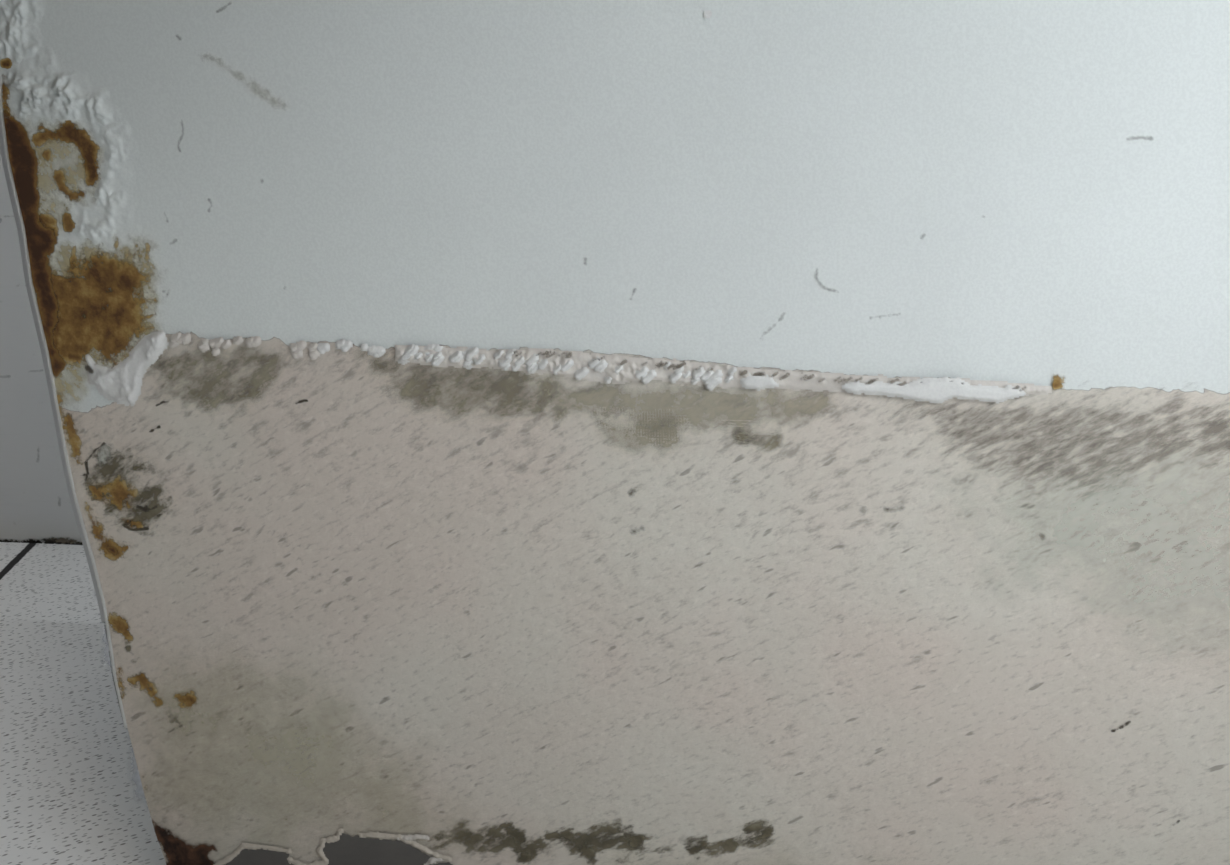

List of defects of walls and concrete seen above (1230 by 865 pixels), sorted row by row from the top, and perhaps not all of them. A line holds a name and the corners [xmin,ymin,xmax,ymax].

corrosion [0,58,157,465]
peeling [169,333,262,356]
peeling [289,339,1052,404]
corrosion [85,475,144,561]
water stain [61,332,1230,865]
corrosion [108,612,133,652]
corrosion [118,668,197,727]
corrosion [152,821,217,865]
peeling [213,828,452,865]